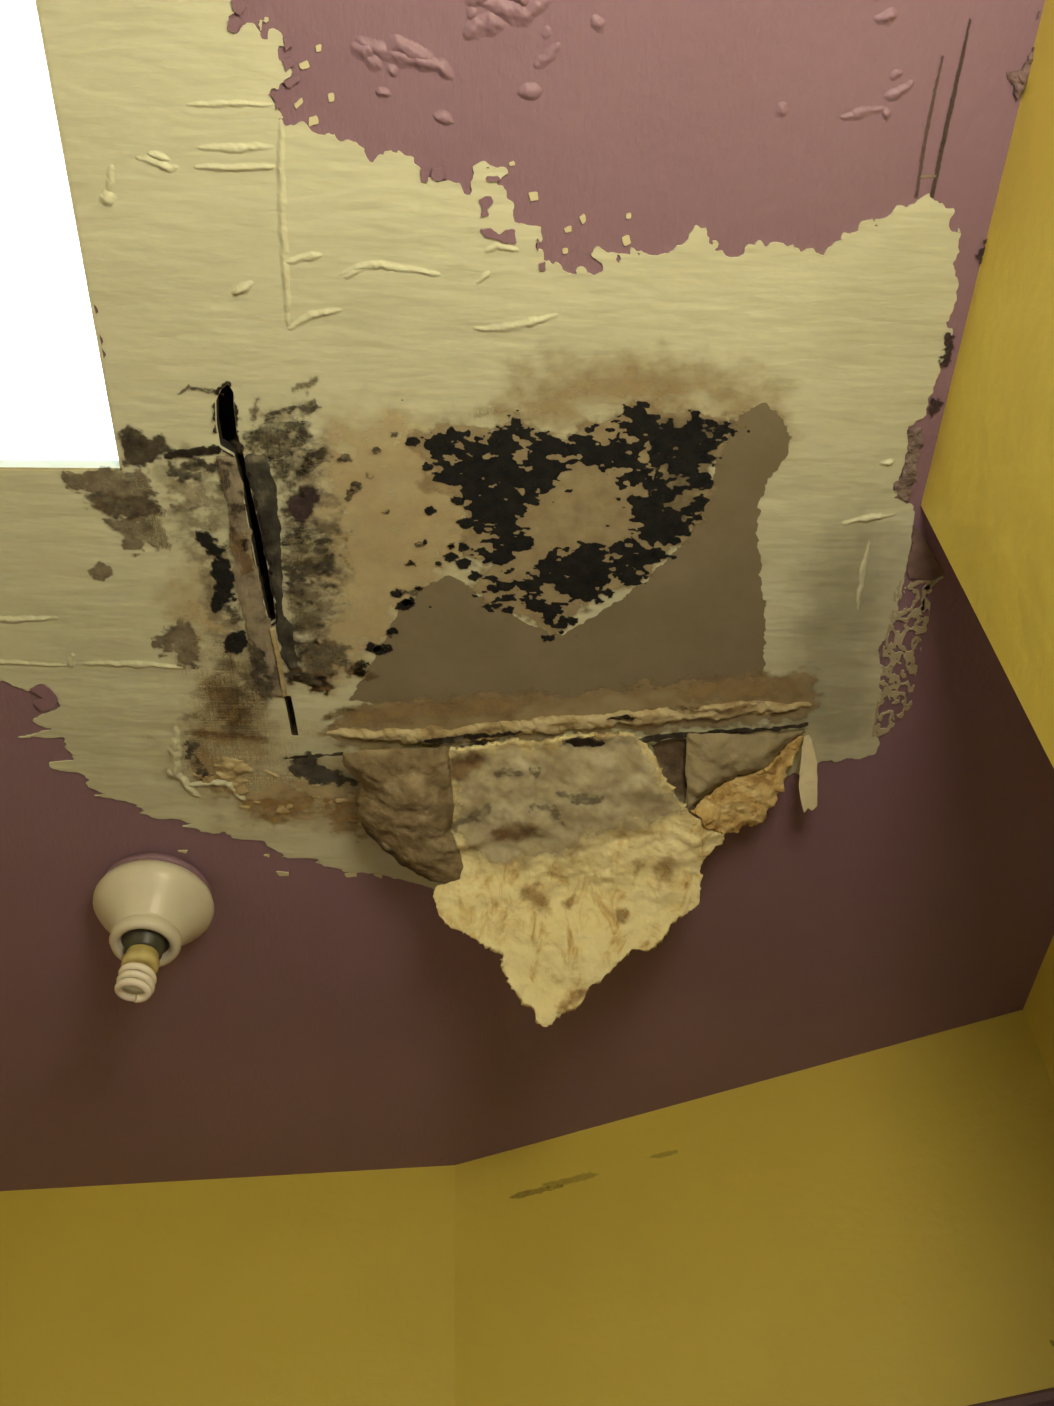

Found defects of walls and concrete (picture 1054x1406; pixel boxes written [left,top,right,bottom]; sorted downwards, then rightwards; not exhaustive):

crack [914,19,971,198]
crack [164,381,278,626]
damp [61,365,792,733]
peeling [0,0,961,890]